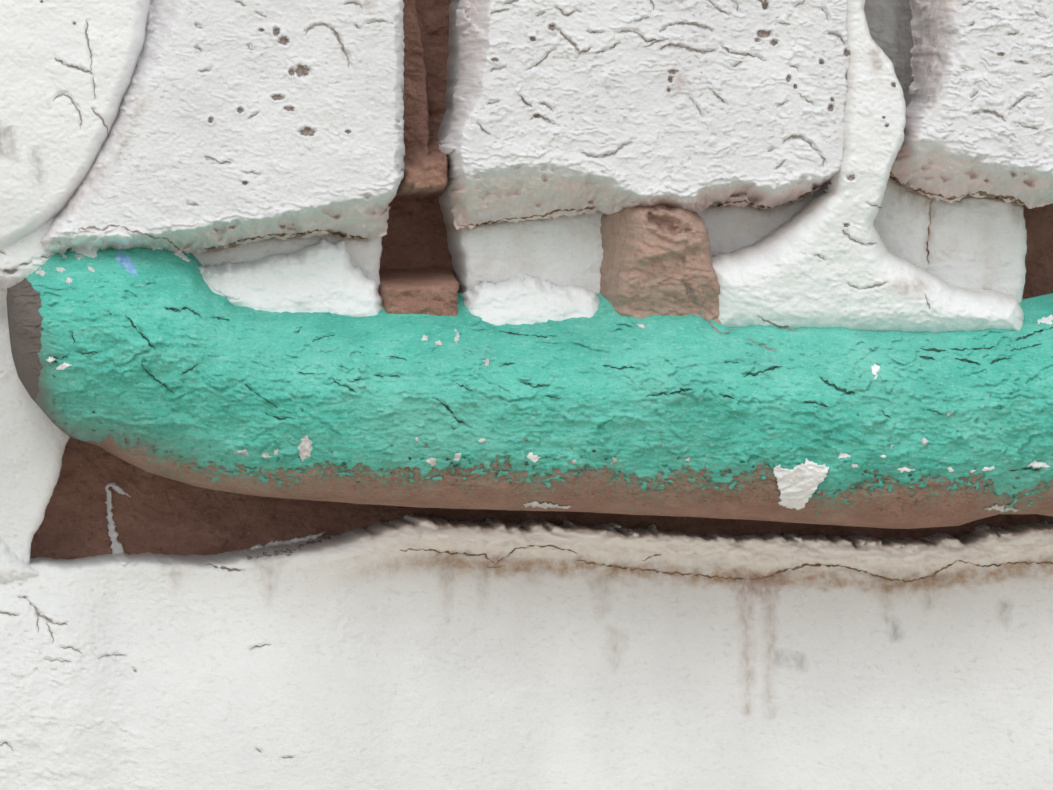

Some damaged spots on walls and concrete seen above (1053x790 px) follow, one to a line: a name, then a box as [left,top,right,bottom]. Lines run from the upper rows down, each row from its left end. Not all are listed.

crack [490,0,844,72]
crack [54,20,109,136]
crack [477,95,556,134]
crack [126,316,198,393]
crack [165,307,229,320]
crack [683,257,797,399]
crack [920,327,1053,365]
crack [804,377,855,407]
peeling [773,453,858,510]
peeling [105,482,136,566]
crack [401,545,1053,583]
crack [0,596,137,672]